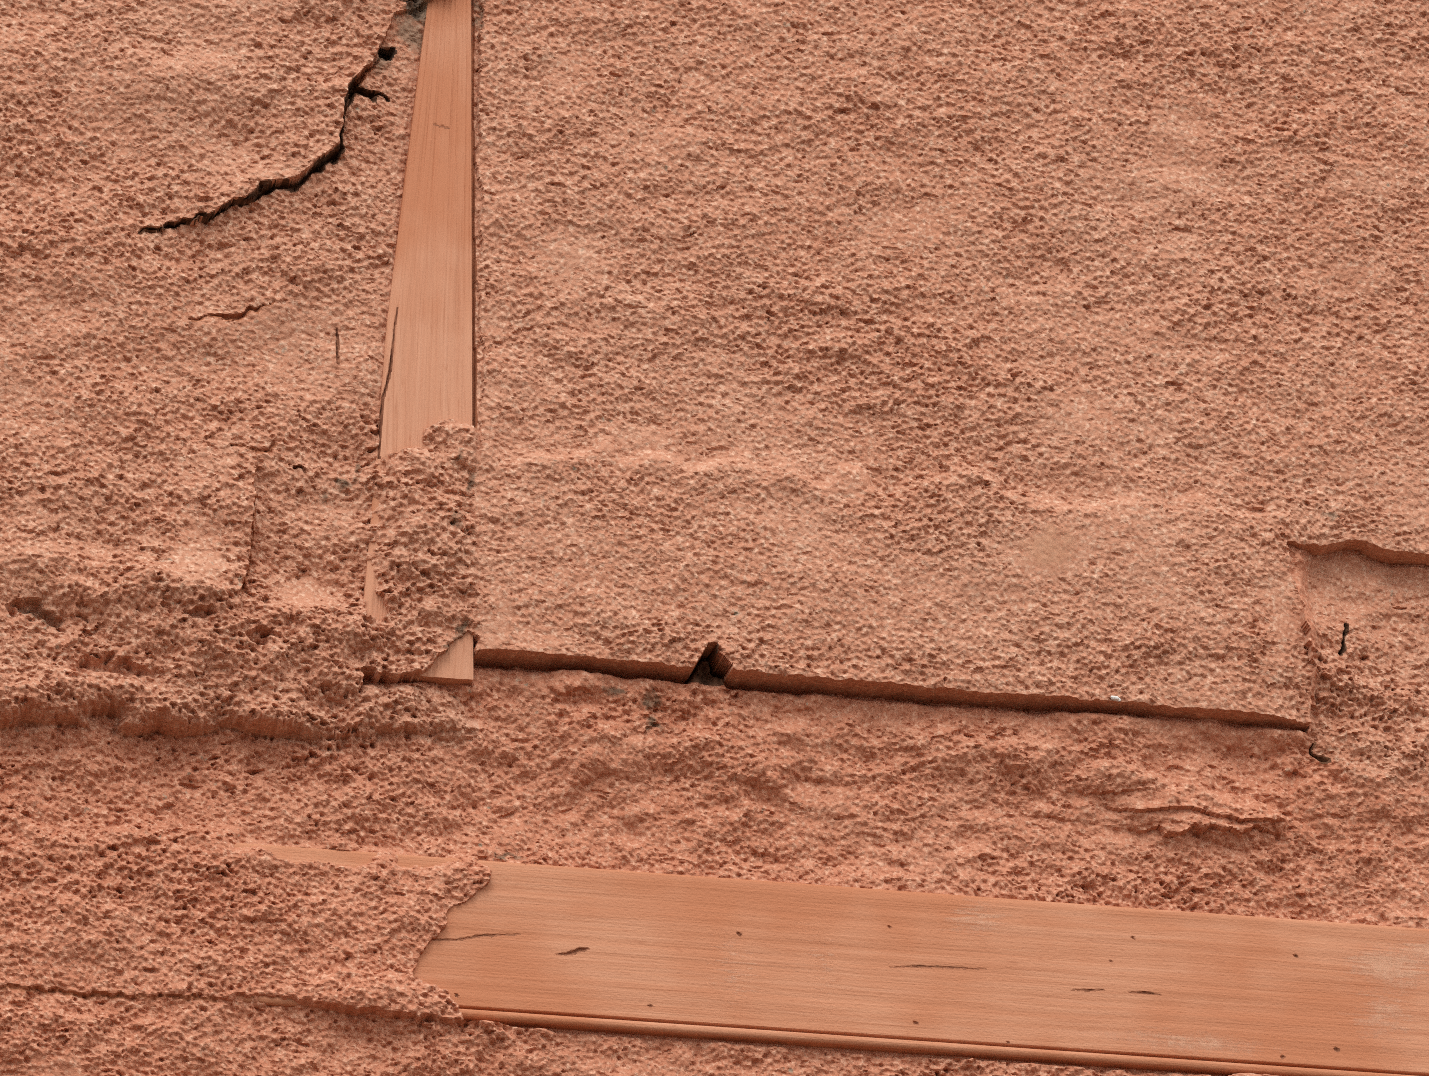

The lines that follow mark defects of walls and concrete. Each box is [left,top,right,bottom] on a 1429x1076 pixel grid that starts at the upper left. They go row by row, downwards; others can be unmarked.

crack [138,57,390,235]